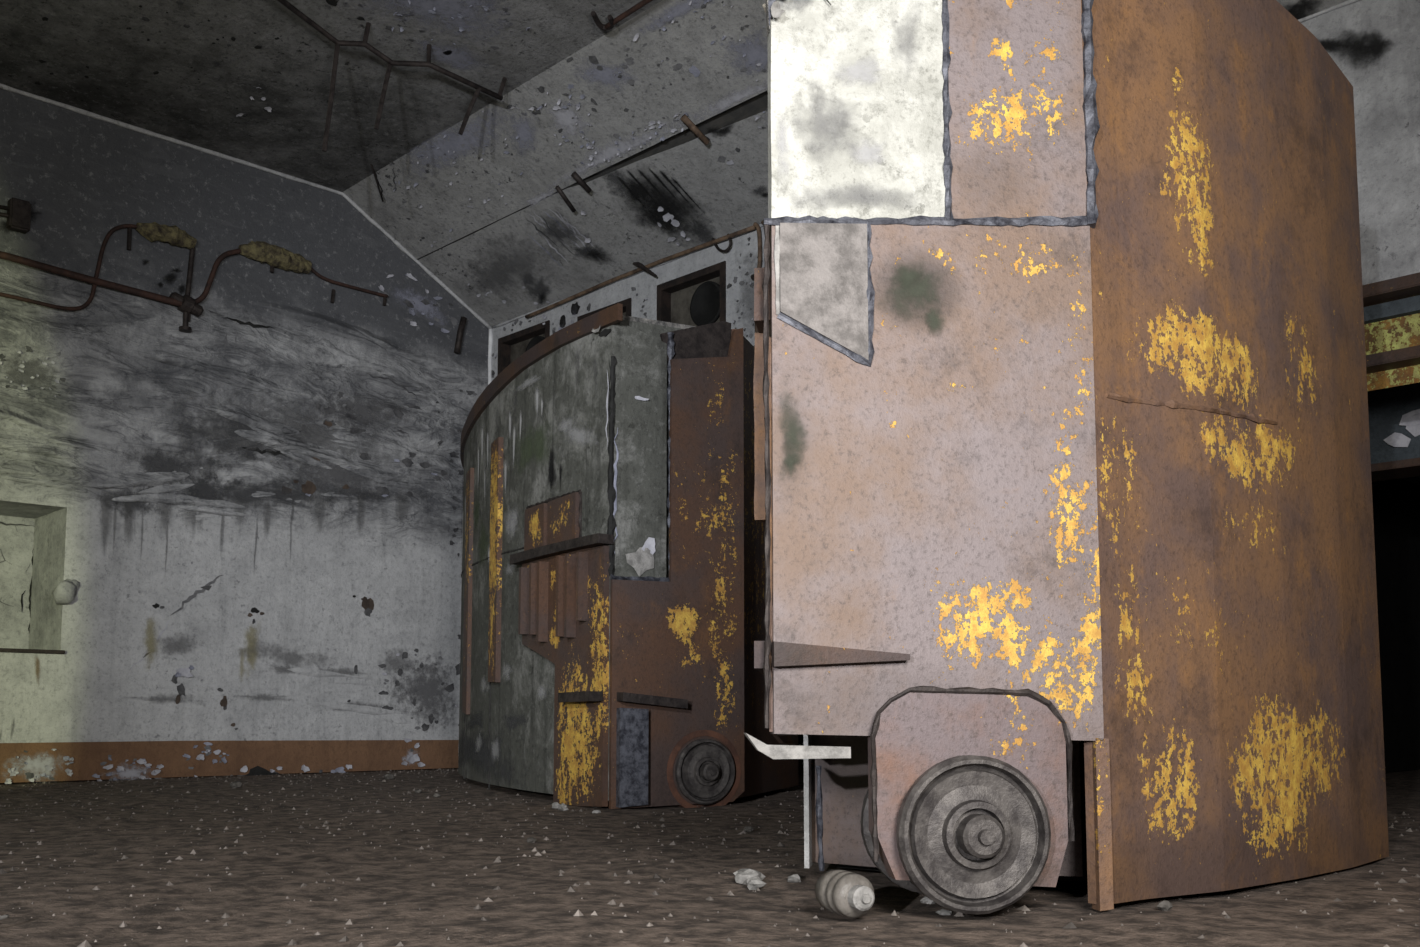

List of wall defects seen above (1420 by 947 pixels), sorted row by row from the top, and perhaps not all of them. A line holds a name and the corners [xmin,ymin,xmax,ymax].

damp [618,169,699,207]
damp [105,488,148,513]
damp [186,480,384,504]